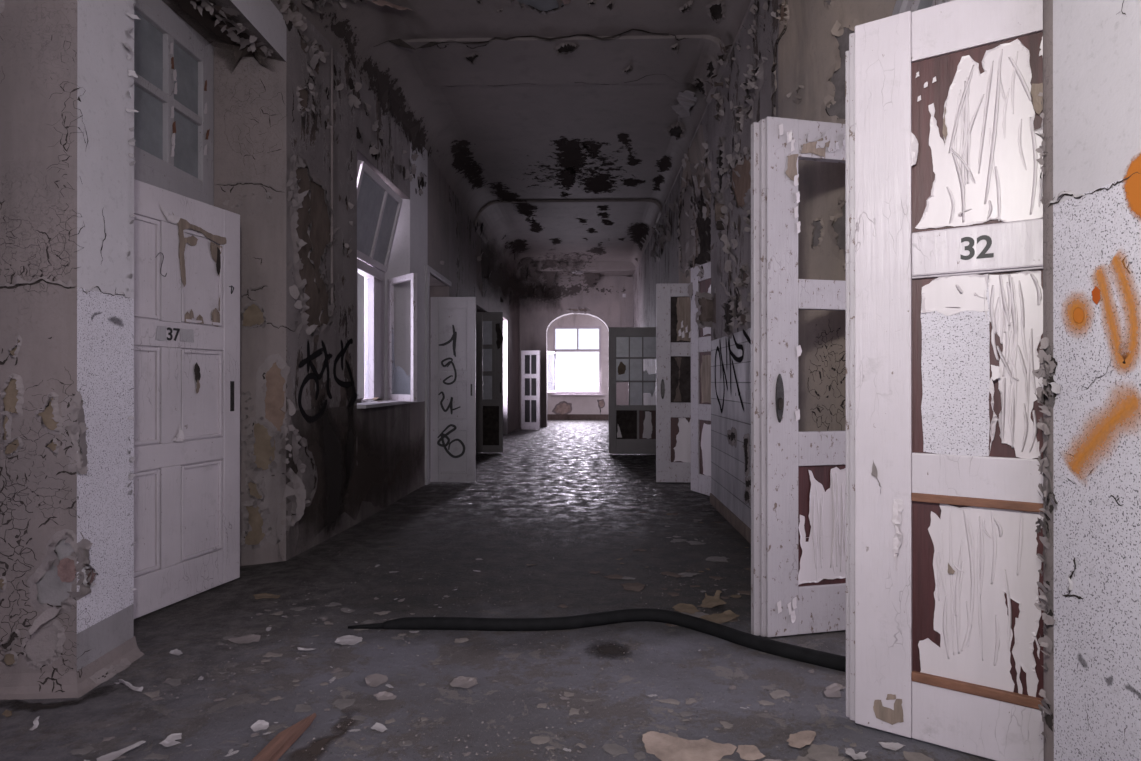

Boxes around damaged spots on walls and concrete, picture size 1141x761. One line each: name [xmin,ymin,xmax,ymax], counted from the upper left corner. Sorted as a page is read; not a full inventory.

crack [0,37,130,298]
peeling [172,212,227,287]
peeling [286,154,354,336]
flaking render [779,16,862,271]
peeling [911,36,1046,229]
crack [1047,172,1140,207]
peeling [0,373,89,475]
flaking render [0,529,99,670]
crack [0,348,116,692]
flaking render [240,353,318,550]
peeling [777,467,846,623]
peeling [918,271,1061,739]